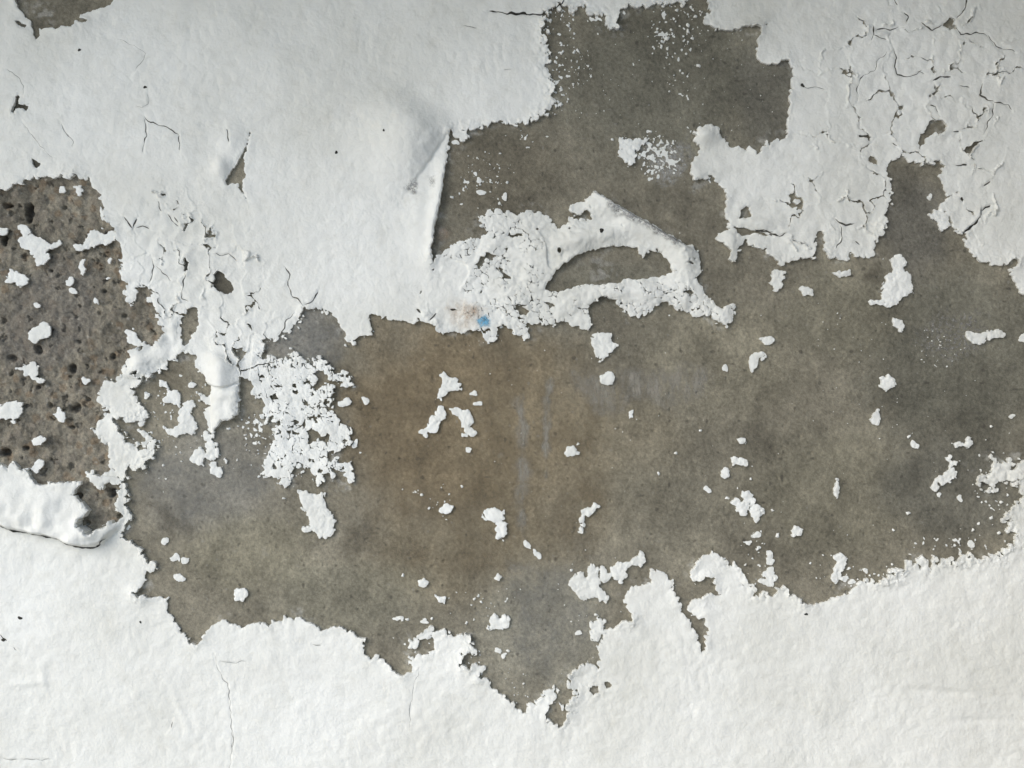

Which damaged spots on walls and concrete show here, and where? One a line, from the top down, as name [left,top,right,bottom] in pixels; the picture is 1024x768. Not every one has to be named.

peeling [16,0,113,39]
crack [841,0,1019,166]
spalling [0,175,183,532]
crack [124,194,235,315]
peeling [180,307,199,346]
peeling [211,271,234,294]
crack [217,293,333,469]
peeling [250,342,355,488]
peeling [411,191,736,344]
crack [756,179,812,237]
crack [836,174,885,247]
crack [961,181,990,233]